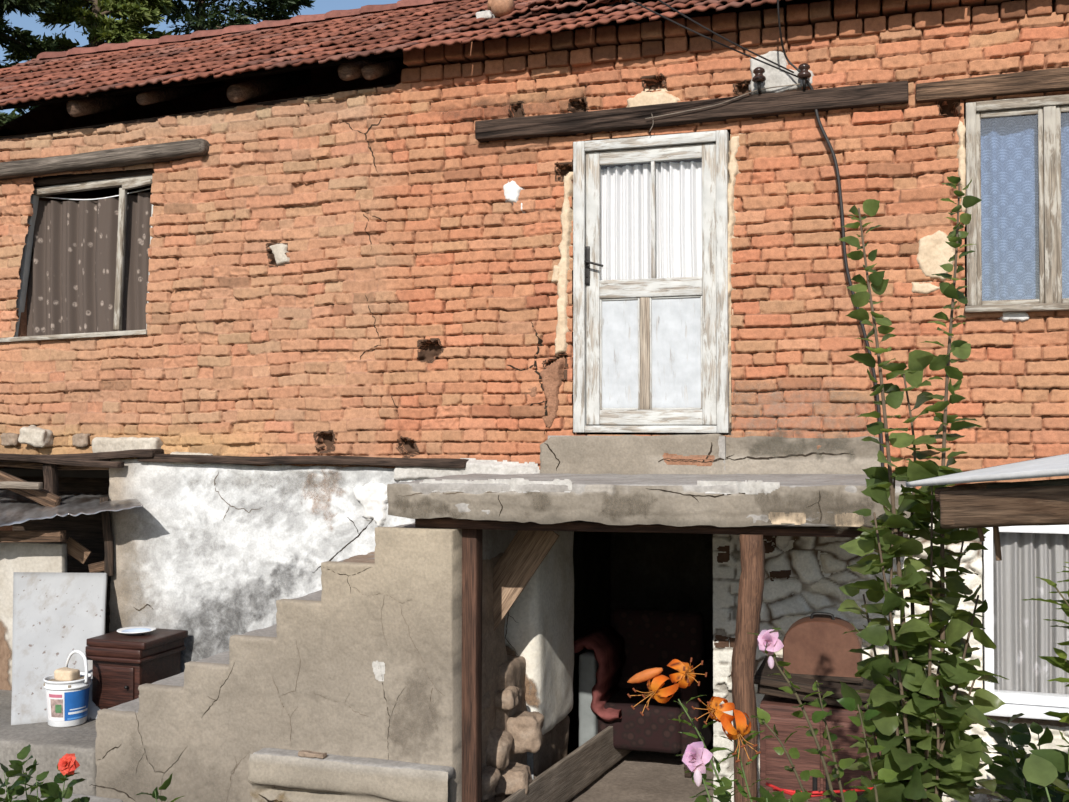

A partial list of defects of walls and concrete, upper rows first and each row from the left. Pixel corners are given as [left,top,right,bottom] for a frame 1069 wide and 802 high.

crack [346,114,387,171]
spalling [417,338,444,363]
crack [508,322,560,471]
spalling [313,430,338,453]
spalling [396,436,420,458]
crack [658,442,855,463]
crack [214,472,262,520]
crack [646,488,745,502]
crack [317,518,442,730]
peeling [0,621,12,690]
crack [90,713,186,801]
crack [226,756,301,802]